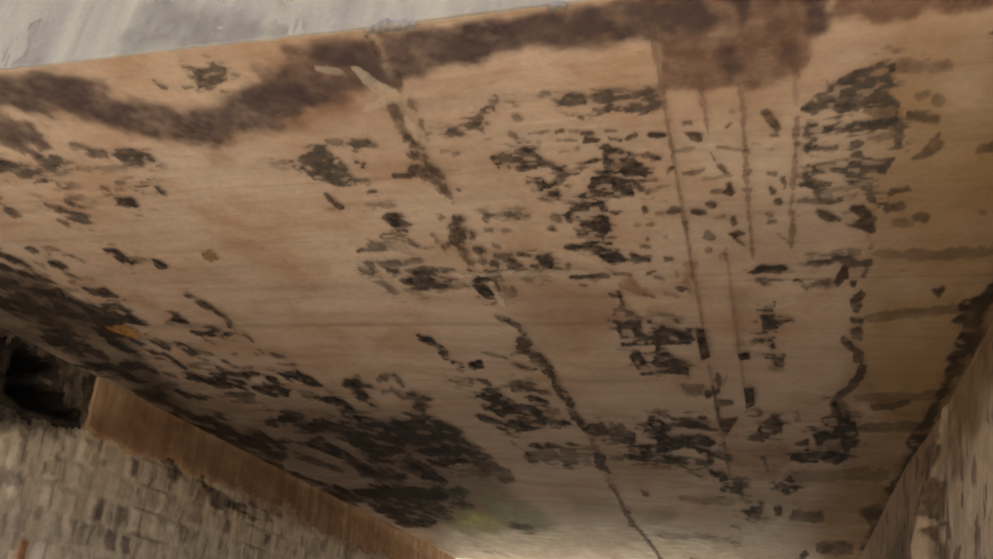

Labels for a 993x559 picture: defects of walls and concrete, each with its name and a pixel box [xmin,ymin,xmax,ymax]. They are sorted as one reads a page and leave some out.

water stain [0,0,719,158]
crack [368,76,502,282]
crack [416,316,662,559]
water stain [133,283,993,559]